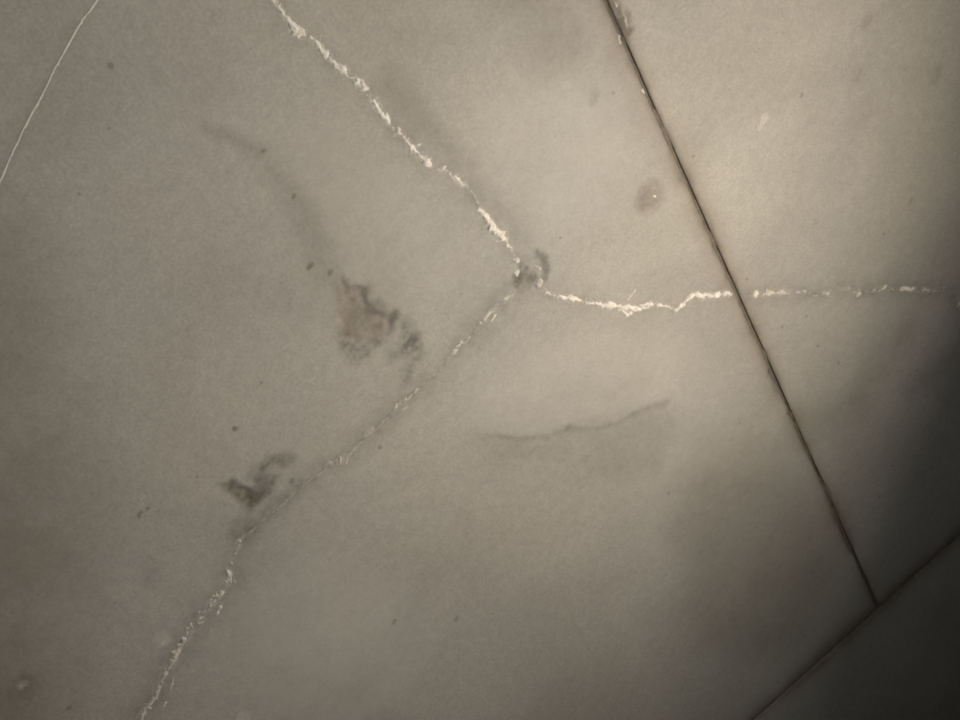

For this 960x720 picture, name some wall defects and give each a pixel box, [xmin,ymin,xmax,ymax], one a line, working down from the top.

crack [0,0,98,183]
crack [271,0,512,252]
crack [545,284,960,318]
crack [268,289,517,516]
crack [139,532,249,720]